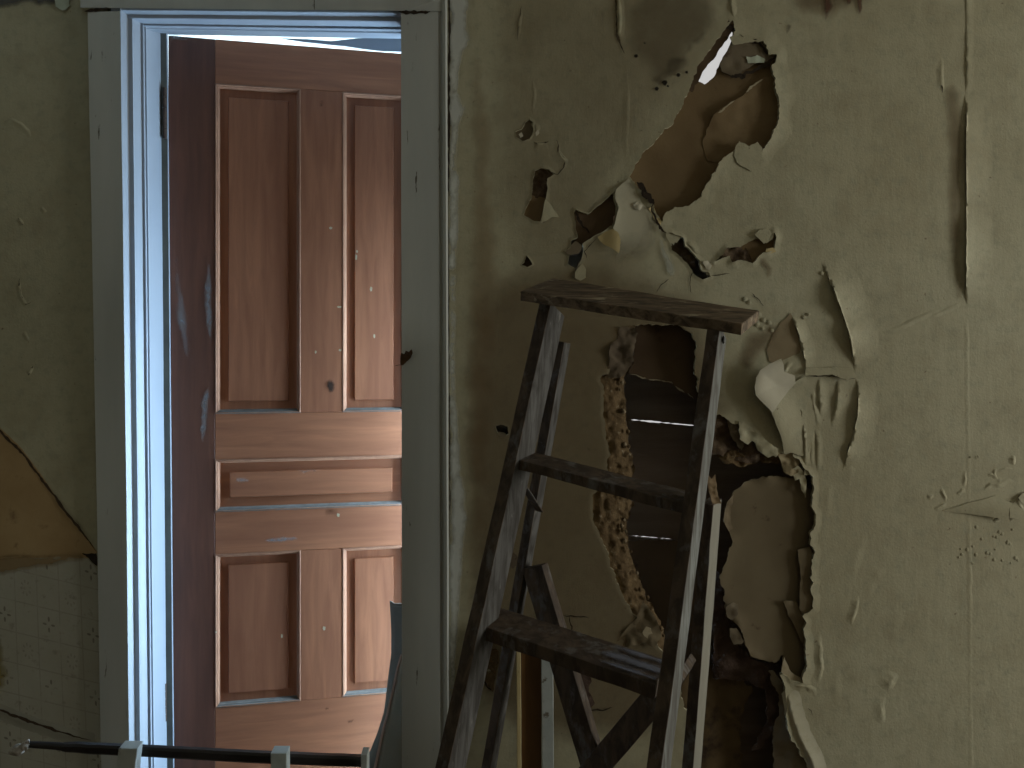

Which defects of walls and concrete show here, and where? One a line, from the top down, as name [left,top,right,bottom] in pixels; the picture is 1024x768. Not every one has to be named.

peeling [746,55,765,63]
spalling [514,116,540,143]
spalling [521,165,559,225]
spalling [702,226,783,275]
spalling [600,324,698,477]
spalling [701,311,827,768]
spalling [592,491,678,651]